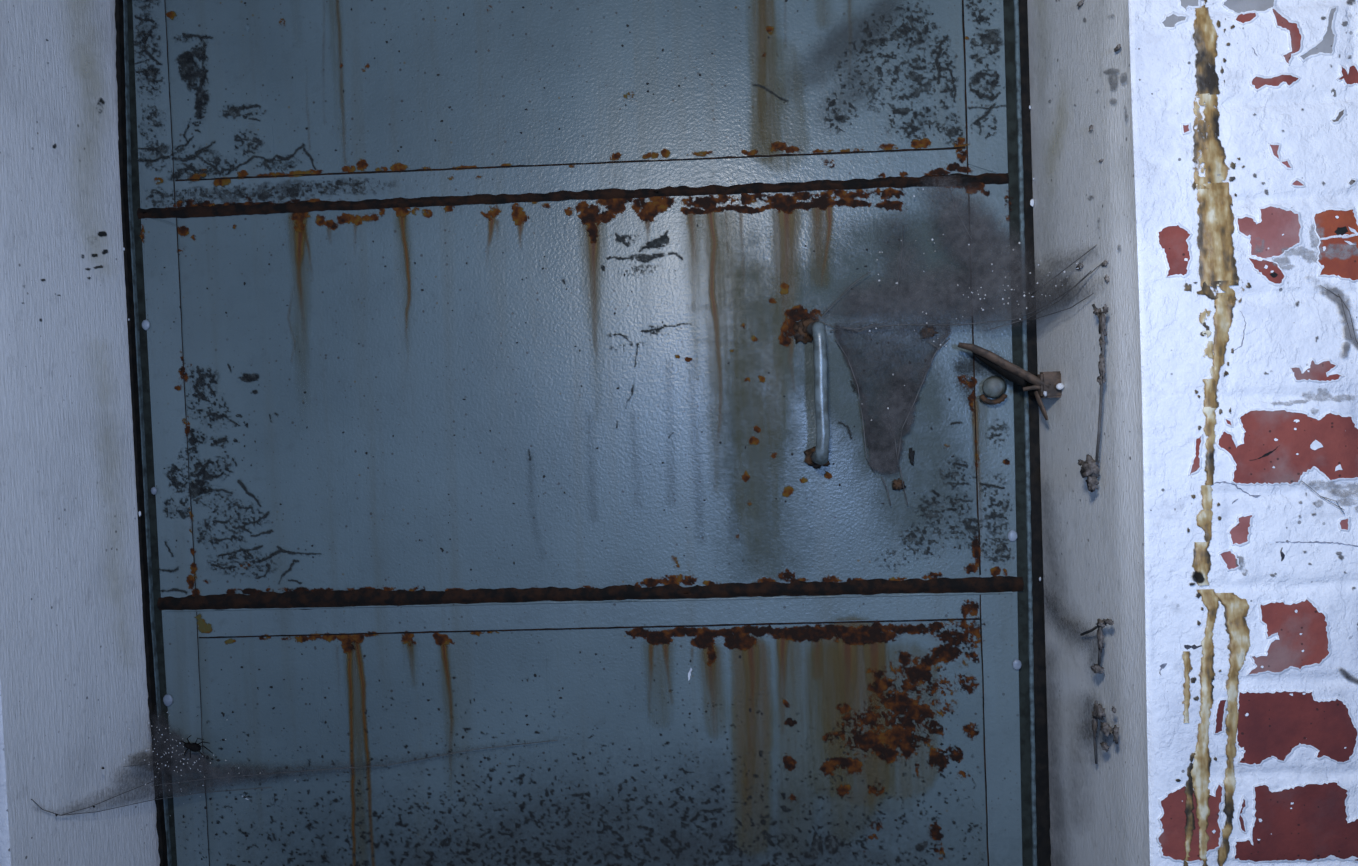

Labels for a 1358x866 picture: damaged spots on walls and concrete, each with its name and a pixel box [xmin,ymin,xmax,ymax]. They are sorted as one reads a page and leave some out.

leakage [825,0,1006,144]
rust [165,196,455,320]
rust [481,171,908,354]
rust [925,137,1012,220]
peeling [1235,204,1358,287]
leakage [164,366,321,584]
leakage [1176,0,1251,866]
peeling [1188,407,1358,487]
leakage [159,541,187,594]
rust [625,599,985,802]
peeling [1213,597,1358,767]
peeling [1156,780,1358,864]